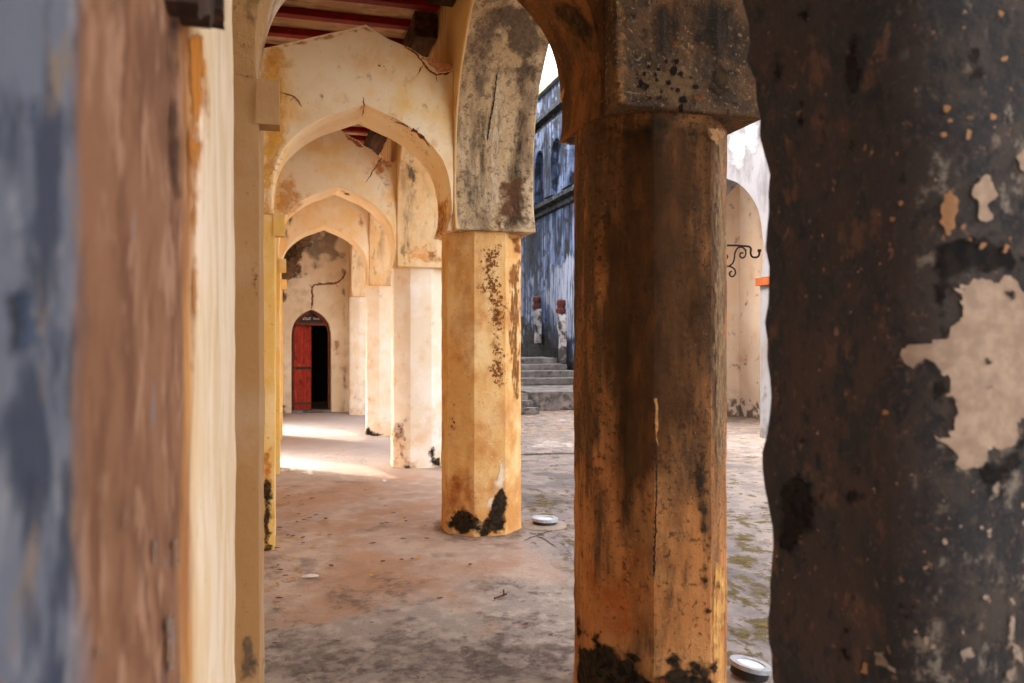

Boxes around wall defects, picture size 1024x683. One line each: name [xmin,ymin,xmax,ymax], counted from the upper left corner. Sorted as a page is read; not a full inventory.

crack [404,45,452,80]
water stain [495,177,528,228]
peeling [939,190,986,249]
peeling [972,174,998,222]
crack [309,270,346,309]
peeling [900,275,1024,470]
water stain [264,453,273,551]
water stain [447,488,507,536]
flaking render [488,463,507,508]
crack [651,443,659,575]
water stain [577,618,715,683]